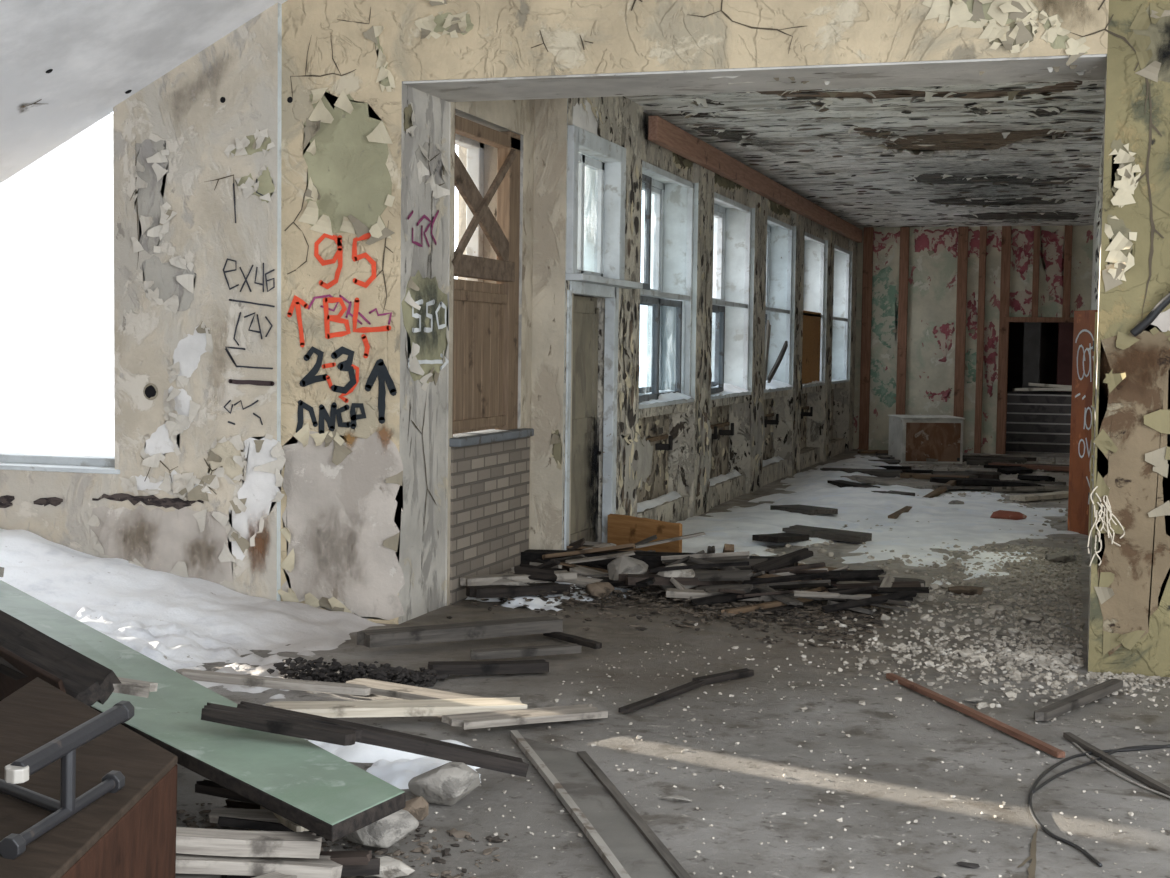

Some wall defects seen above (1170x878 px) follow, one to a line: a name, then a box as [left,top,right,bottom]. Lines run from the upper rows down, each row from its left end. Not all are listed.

crack [290,8,371,100]
crack [687,0,805,54]
spalling [1128,1,1170,83]
peeling [131,139,196,315]
peeling [298,87,395,245]
peeling [404,102,452,200]
peeling [625,165,639,263]
peeling [631,0,1141,317]
peeling [87,321,405,620]
peeling [616,294,669,517]
peeling [870,266,899,408]
spalling [1090,291,1170,656]